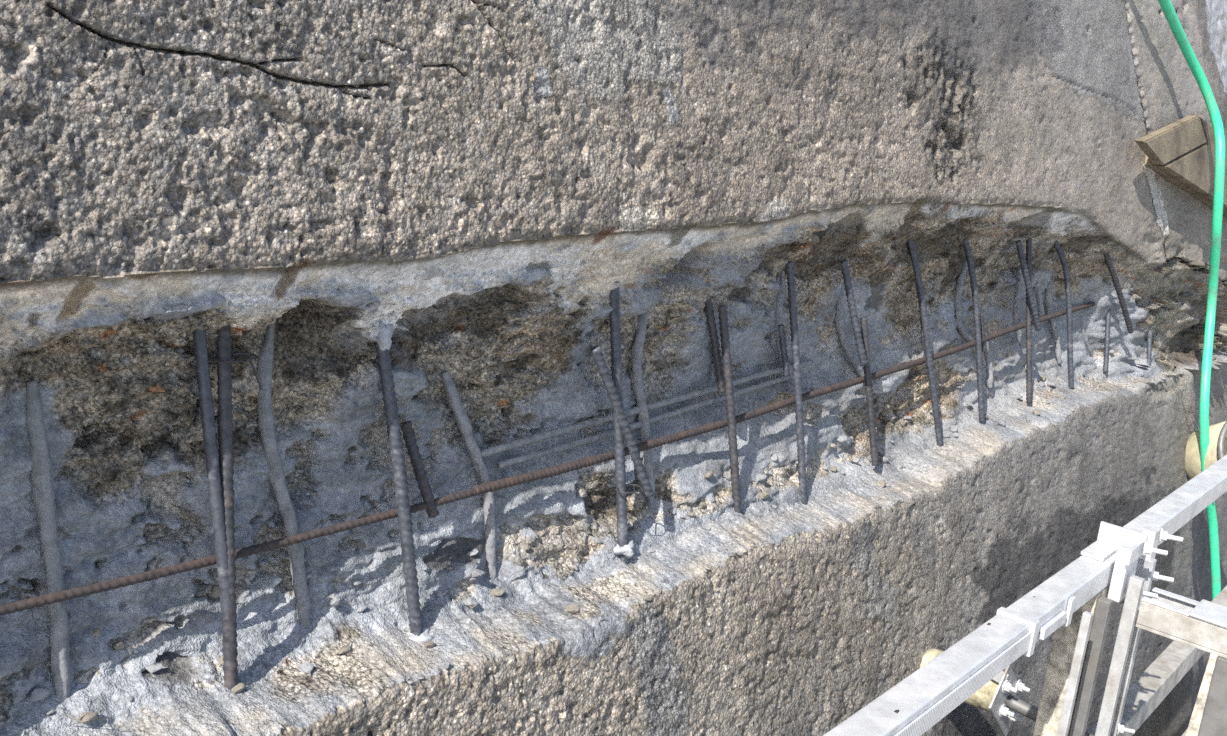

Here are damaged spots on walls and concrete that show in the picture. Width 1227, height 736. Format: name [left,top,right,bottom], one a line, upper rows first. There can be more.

crack [47,5,387,99]
crack [375,39,464,76]
spalling [0,198,1227,736]